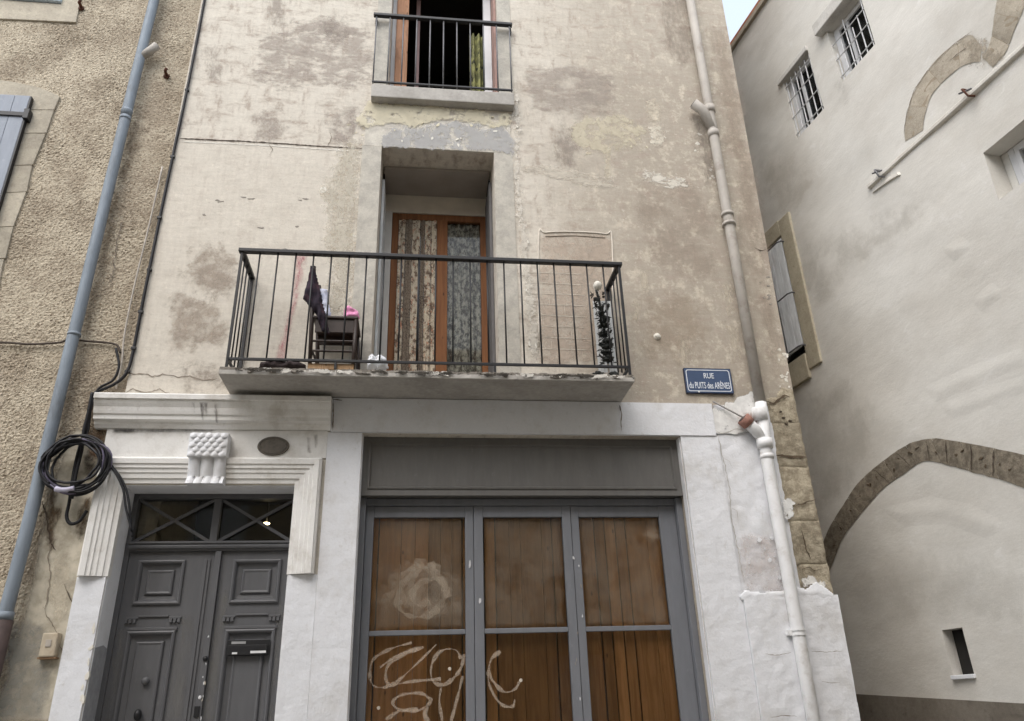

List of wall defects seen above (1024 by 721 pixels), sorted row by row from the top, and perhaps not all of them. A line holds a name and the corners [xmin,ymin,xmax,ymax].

crack [180,133,362,152]
flaking render [642,169,688,188]
peeling [320,101,518,311]
crack [119,373,217,393]
spalling [712,371,834,595]